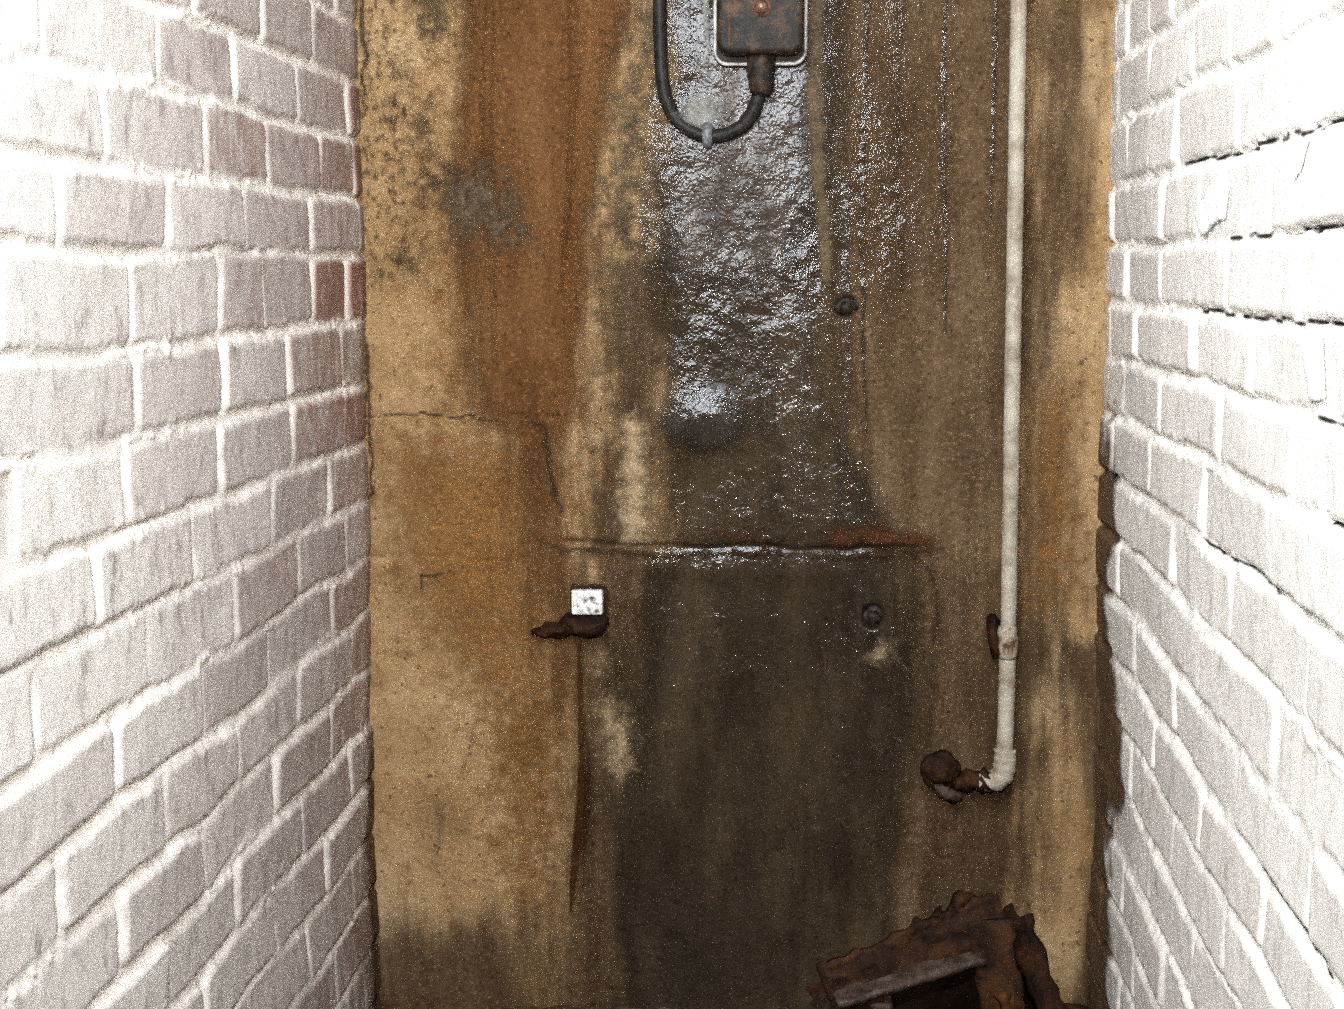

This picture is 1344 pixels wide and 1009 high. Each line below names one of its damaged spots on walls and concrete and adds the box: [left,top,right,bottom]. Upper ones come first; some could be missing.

crack [359,0,369,119]
corrosion [386,0,632,912]
crack [361,302,938,641]
damp [357,0,1049,1009]
damp [1022,0,1090,419]
crack [1185,117,1344,165]
crack [1203,308,1344,326]
crack [1318,415,1344,426]
damp [1067,428,1125,1009]